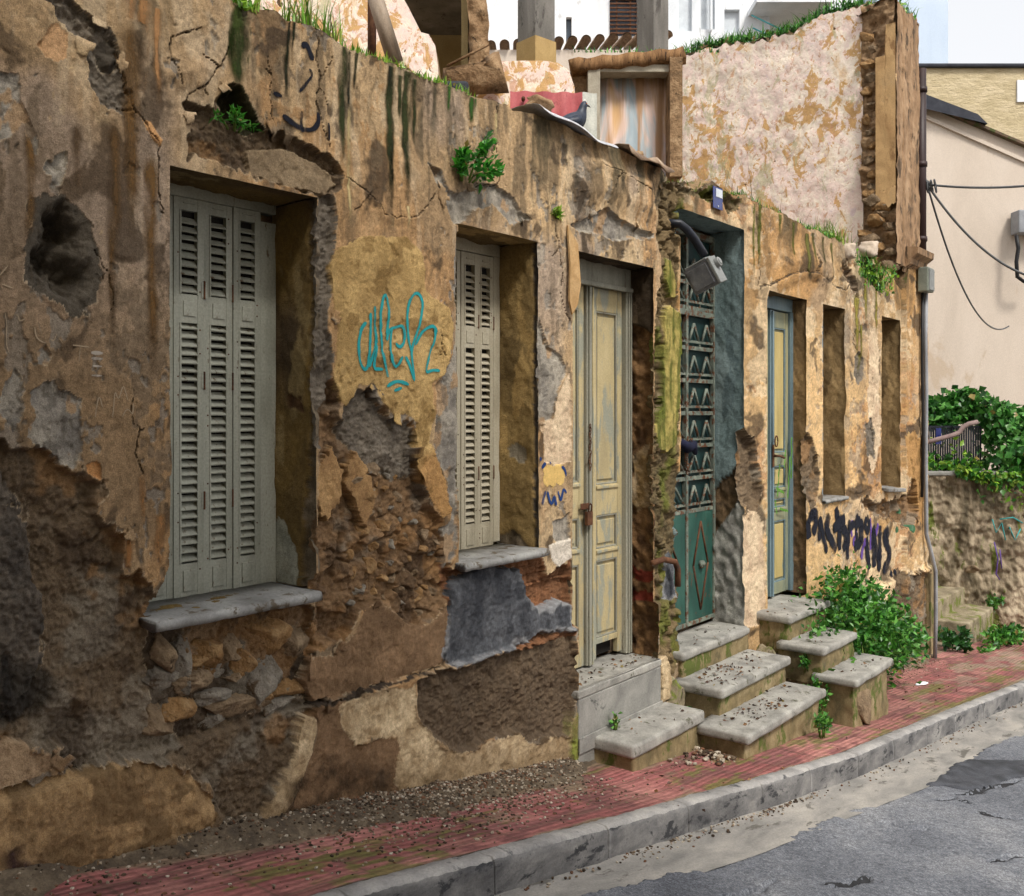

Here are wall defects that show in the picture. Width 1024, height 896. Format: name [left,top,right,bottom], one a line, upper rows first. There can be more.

flaking render [37,0,129,115]
crack [169,26,229,102]
leakage [285,22,296,90]
leakage [338,47,358,210]
leakage [386,66,416,189]
crack [130,397,145,474]
flaking render [0,71,464,819]
flaking render [567,181,742,701]
peeling [734,427,766,626]
flaking render [800,431,821,511]
flaking render [417,557,579,753]